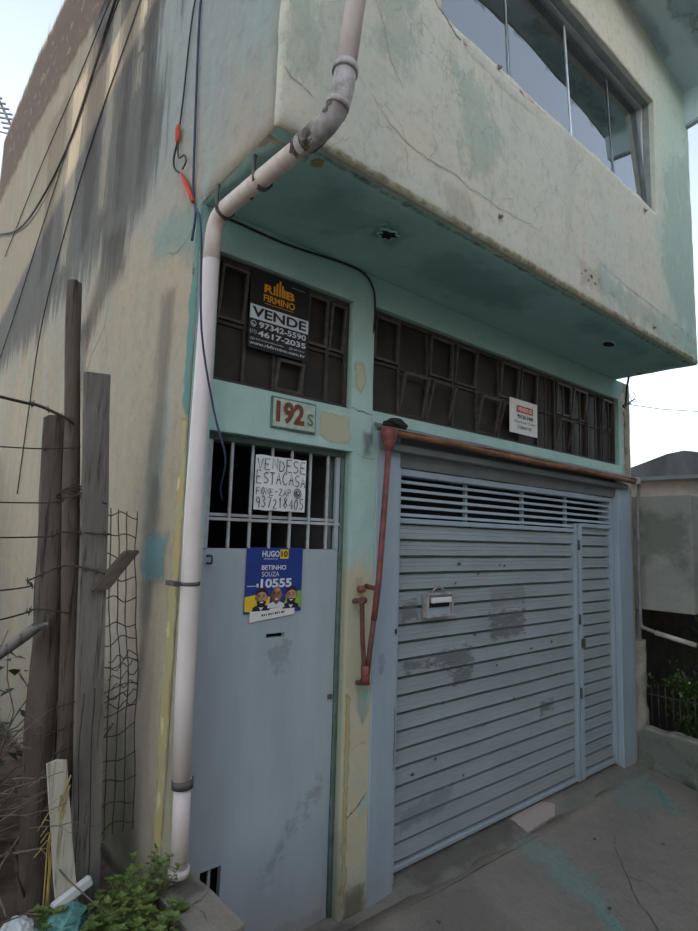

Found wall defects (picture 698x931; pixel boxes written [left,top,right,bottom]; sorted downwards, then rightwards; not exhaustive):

crack [435,0,474,56]
leakage [0,0,166,366]
crack [372,94,541,232]
peeling [320,411,350,443]